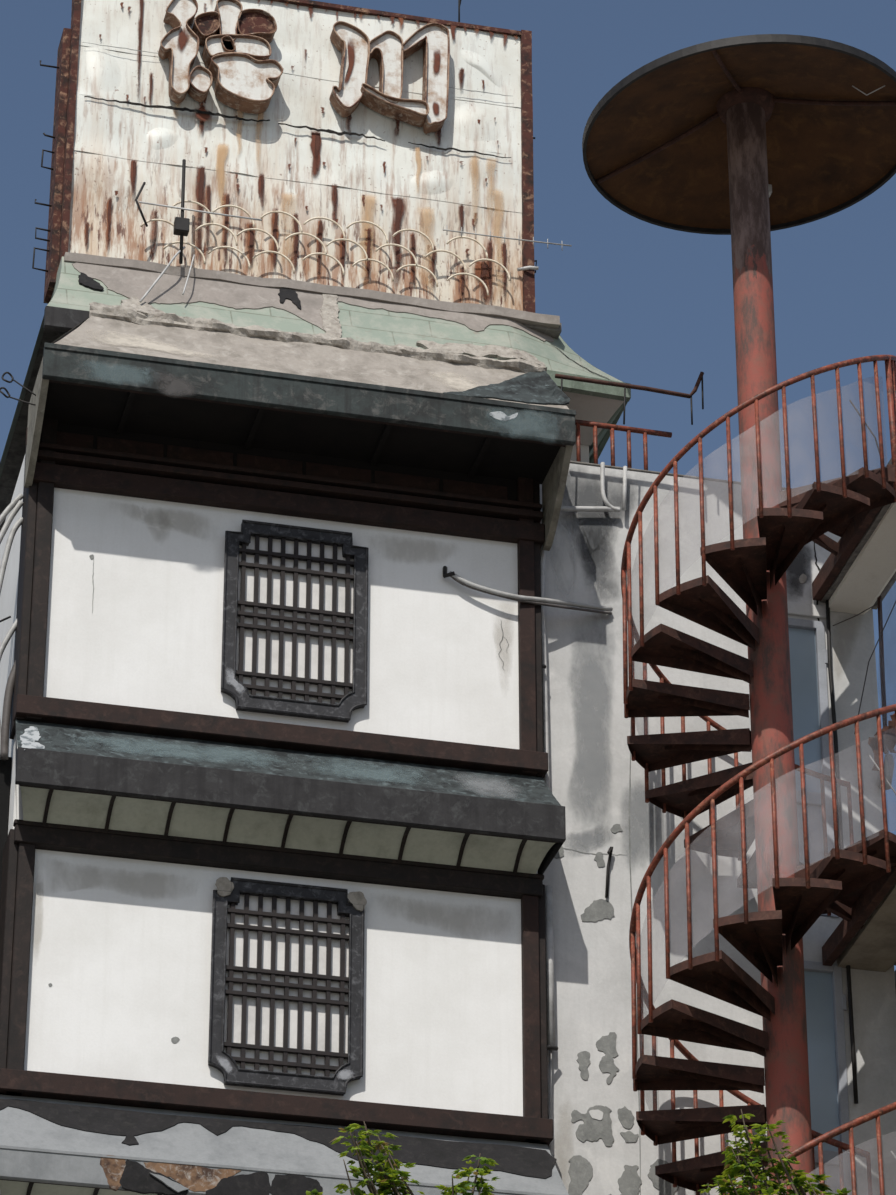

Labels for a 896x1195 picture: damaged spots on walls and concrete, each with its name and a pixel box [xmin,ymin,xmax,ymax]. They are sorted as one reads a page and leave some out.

corrosion [84,0,518,300]
peeling [72,262,554,342]
damp [553,473,631,592]
spalling [594,852,605,867]
spalling [576,1032,619,1084]
peeling [0,1099,639,1195]
spalling [609,1159,679,1195]